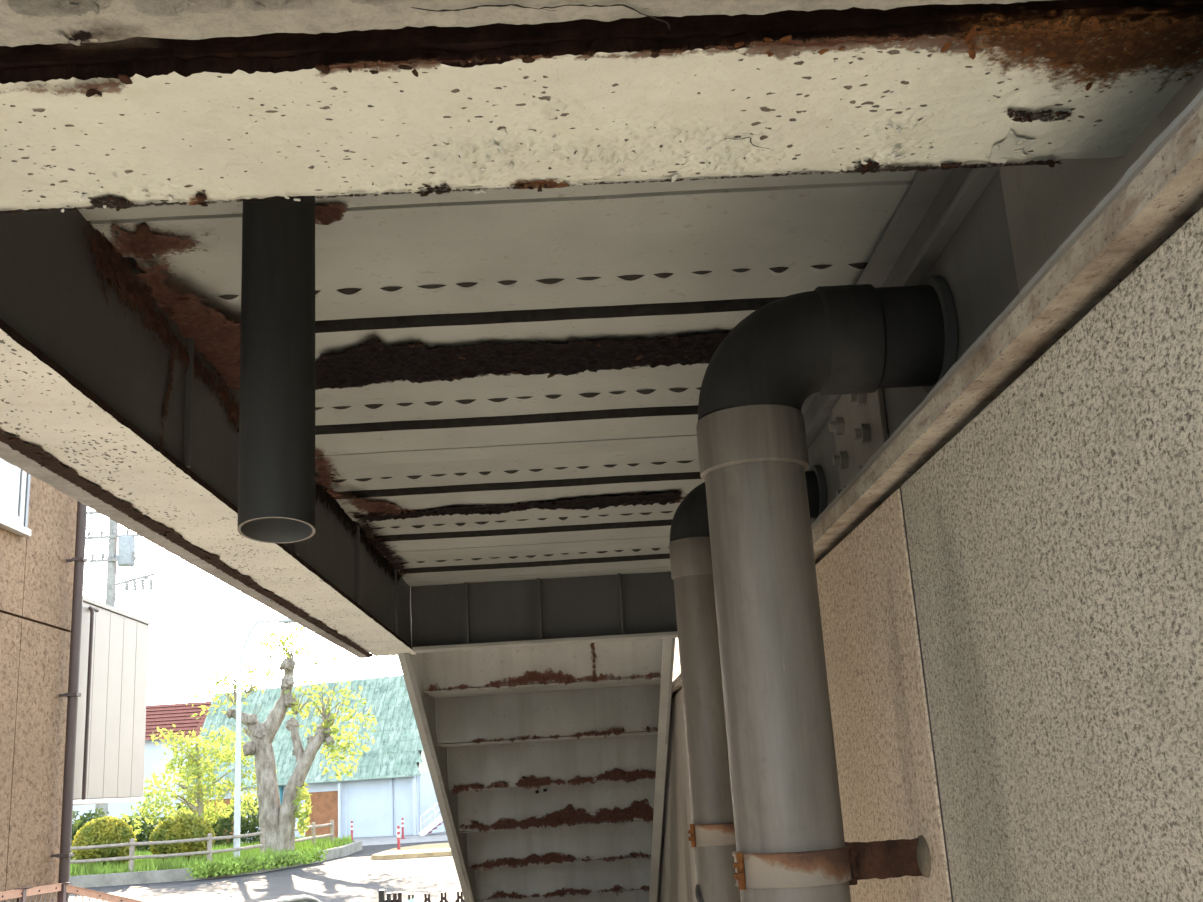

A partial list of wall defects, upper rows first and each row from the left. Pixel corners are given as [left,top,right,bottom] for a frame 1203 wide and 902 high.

rust [0,0,1203,97]
rust [0,159,1063,447]
rust [315,449,685,582]
rust [0,429,377,657]
rust [428,643,661,691]
rust [472,727,625,743]
rust [451,768,656,795]
rust [460,799,654,832]
rust [471,851,650,870]
rust [478,885,650,901]